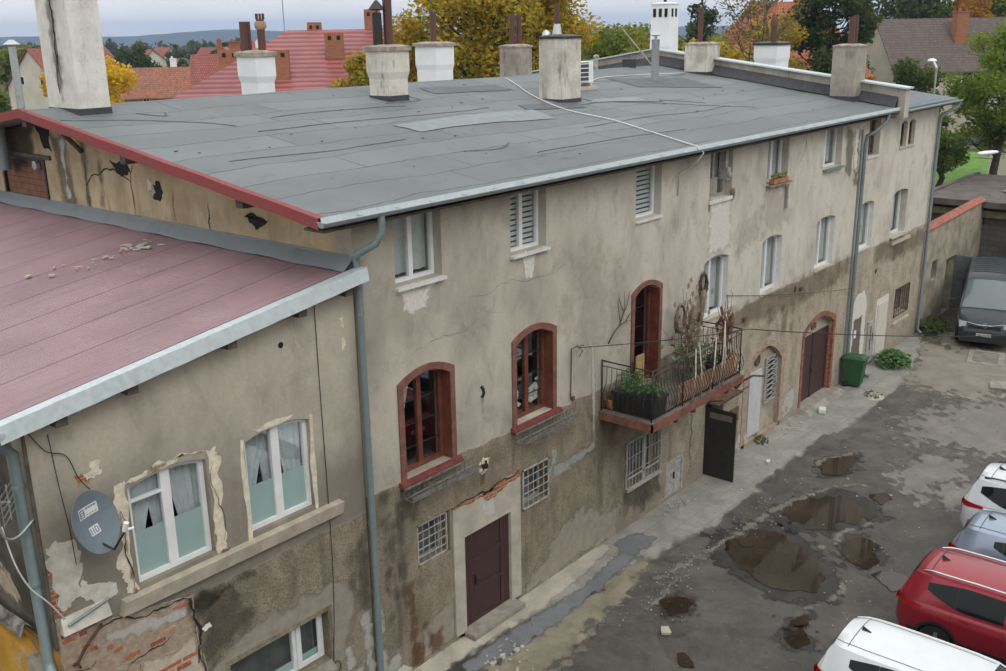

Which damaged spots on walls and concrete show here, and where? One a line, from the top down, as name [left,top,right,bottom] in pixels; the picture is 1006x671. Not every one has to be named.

crack [49,1,61,93]
spalling [35,126,52,151]
crack [84,163,135,208]
spalling [110,161,131,177]
spalling [146,178,163,201]
spalling [244,213,267,230]
peeling [240,439,253,540]
water stain [549,441,595,477]
flaking render [45,446,228,671]
crack [101,598,207,671]
water stain [202,585,251,660]
rust [408,584,443,666]